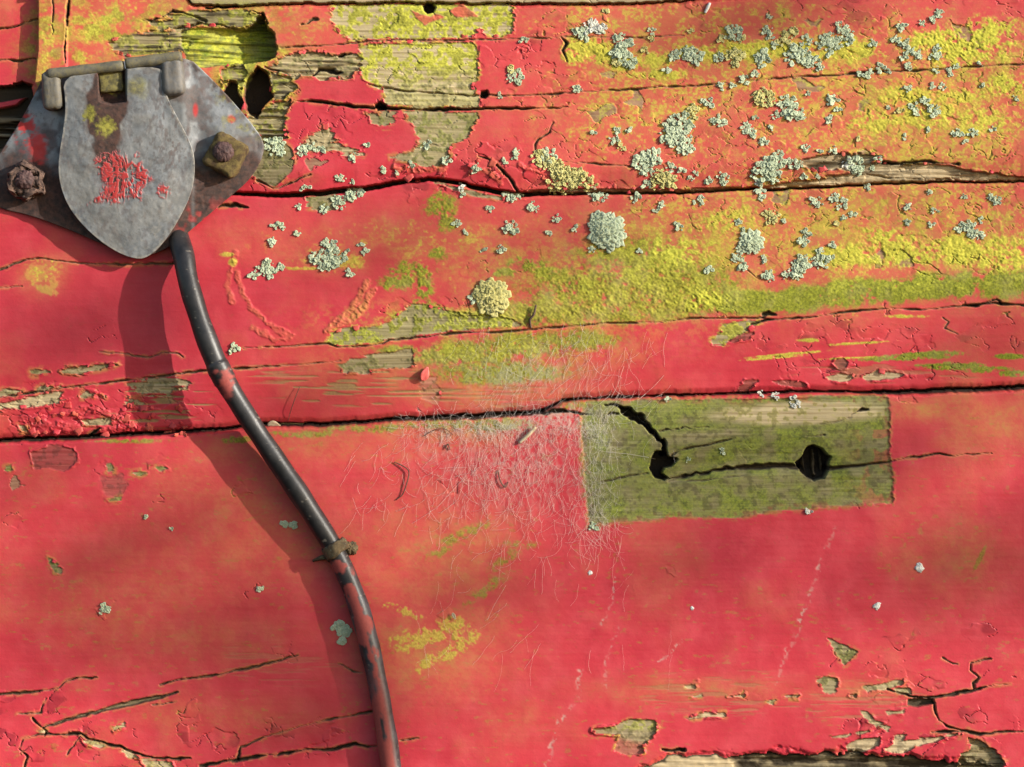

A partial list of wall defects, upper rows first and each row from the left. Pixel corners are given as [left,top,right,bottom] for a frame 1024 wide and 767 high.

peeling [329,1,516,168]
peeling [251,122,366,188]
crack [477,155,520,193]
crack [866,159,961,182]
peeling [0,362,122,414]
crack [232,298,1024,371]
peeling [824,357,908,385]
crack [539,404,992,484]
crack [0,655,420,767]
peeling [590,719,659,756]
peeling [816,676,964,755]
crack [886,656,1024,737]